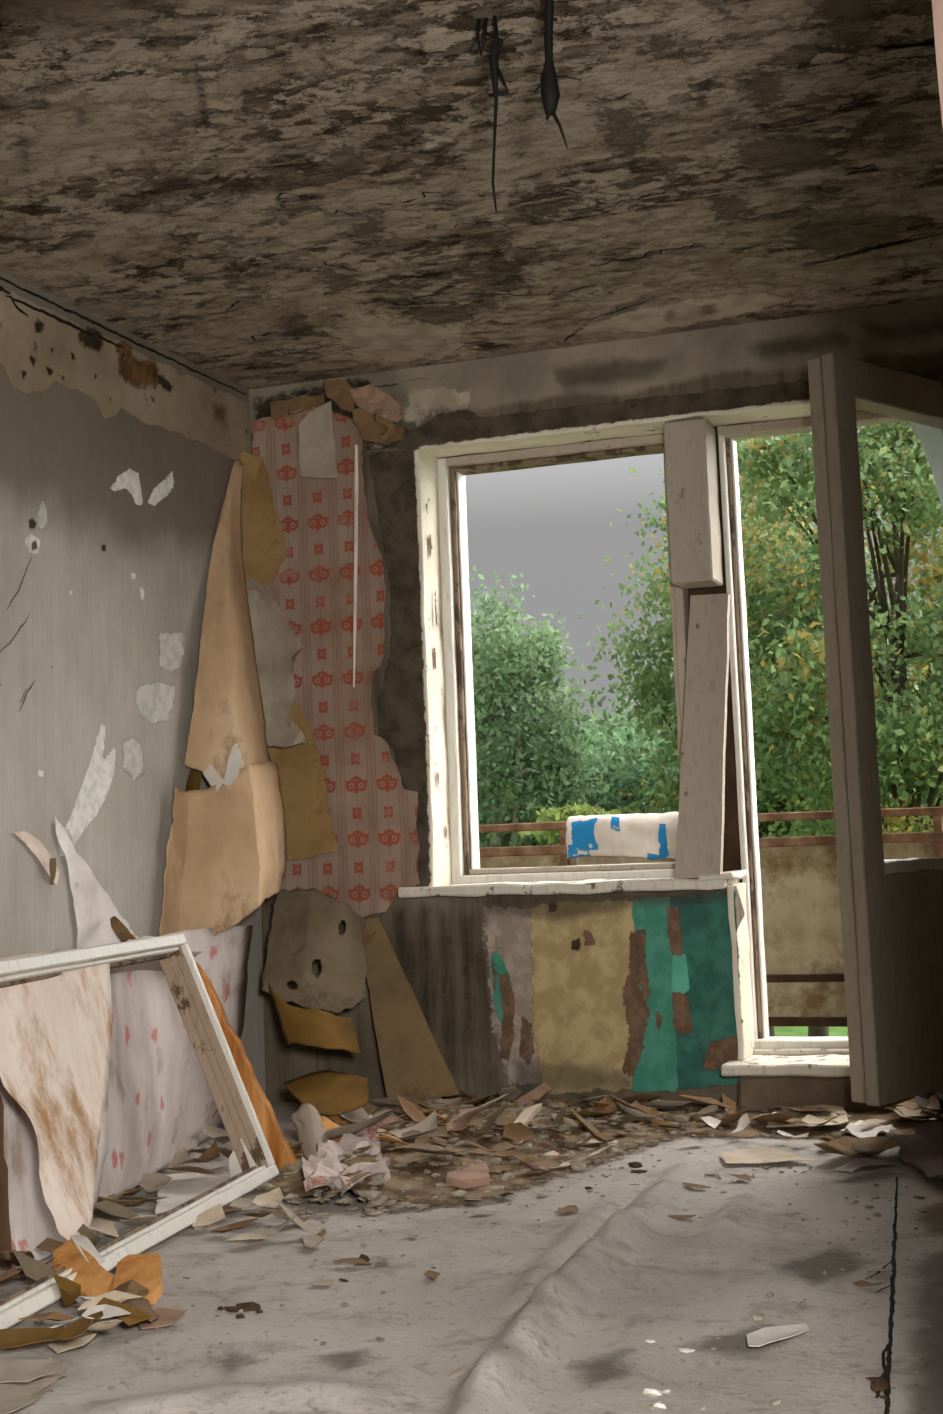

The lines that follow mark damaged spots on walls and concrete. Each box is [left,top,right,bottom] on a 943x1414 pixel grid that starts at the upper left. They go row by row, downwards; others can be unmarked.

water stain [71,327,103,359]
peeling [482,891,743,1095]
crack [865,1176,898,1414]